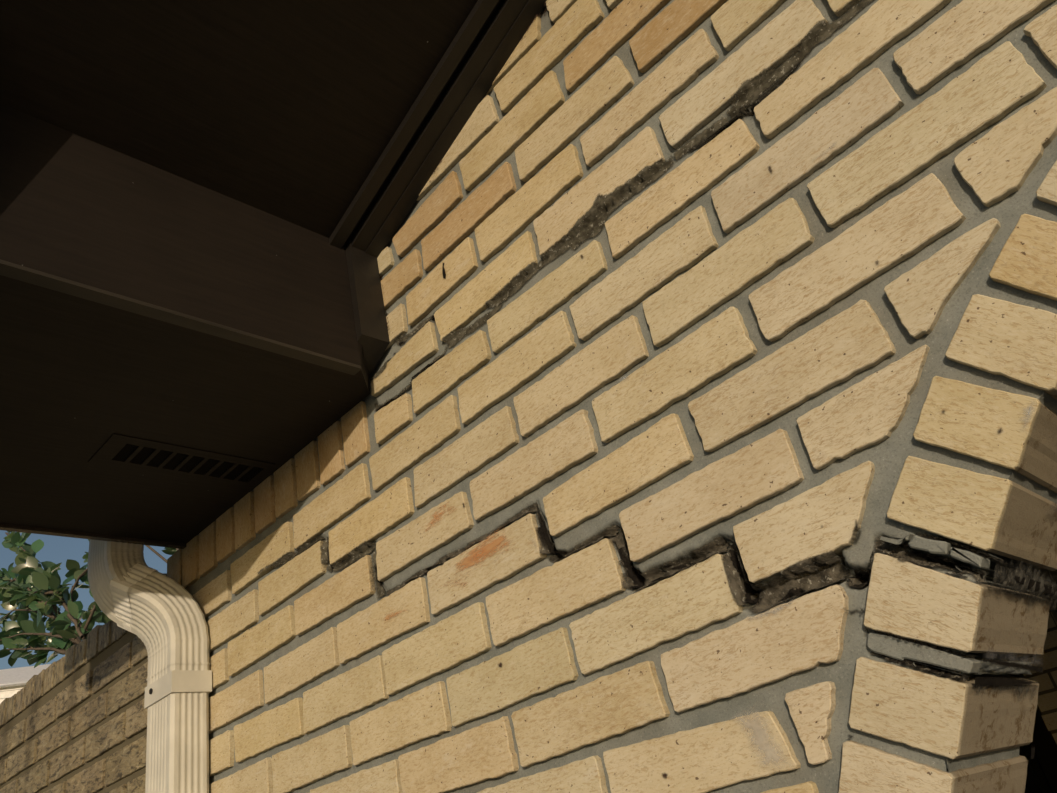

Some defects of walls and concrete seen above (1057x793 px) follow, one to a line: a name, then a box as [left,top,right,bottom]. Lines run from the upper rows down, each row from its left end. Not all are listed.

crack [370,0,872,412]
crack [258,502,1057,686]